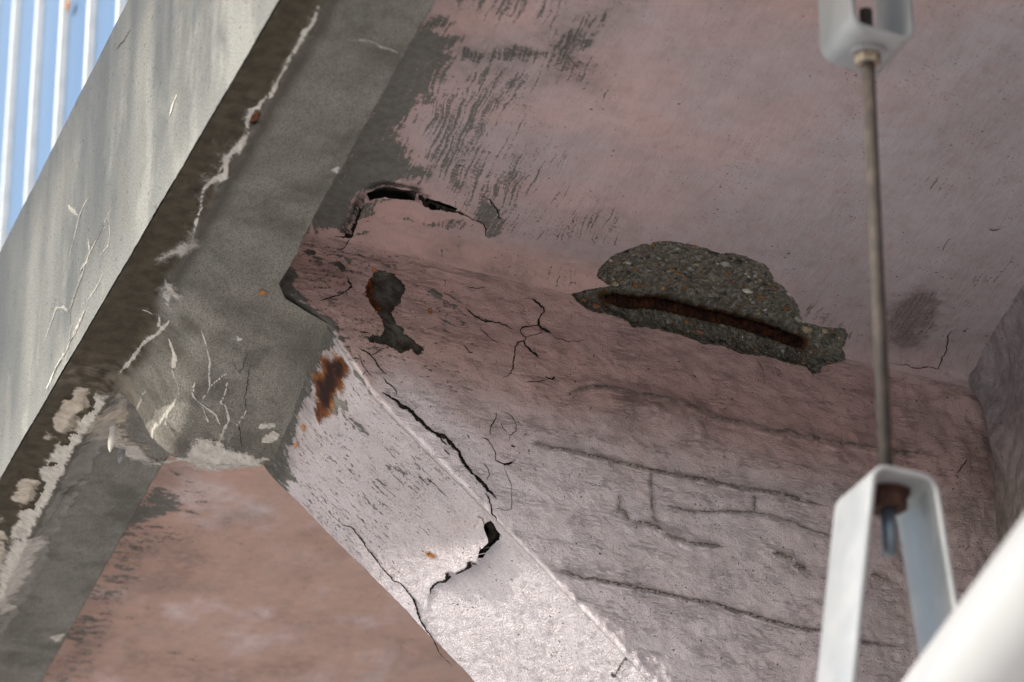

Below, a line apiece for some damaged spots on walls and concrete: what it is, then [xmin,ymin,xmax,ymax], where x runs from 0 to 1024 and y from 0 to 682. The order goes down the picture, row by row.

damp [160,6,319,260]
crack [337,181,503,250]
crack [320,275,352,301]
flaking render [365,270,424,355]
crack [444,286,581,382]
spalling [571,241,848,374]
damp [259,423,280,443]
corrosion [312,352,350,422]
crack [358,331,517,520]